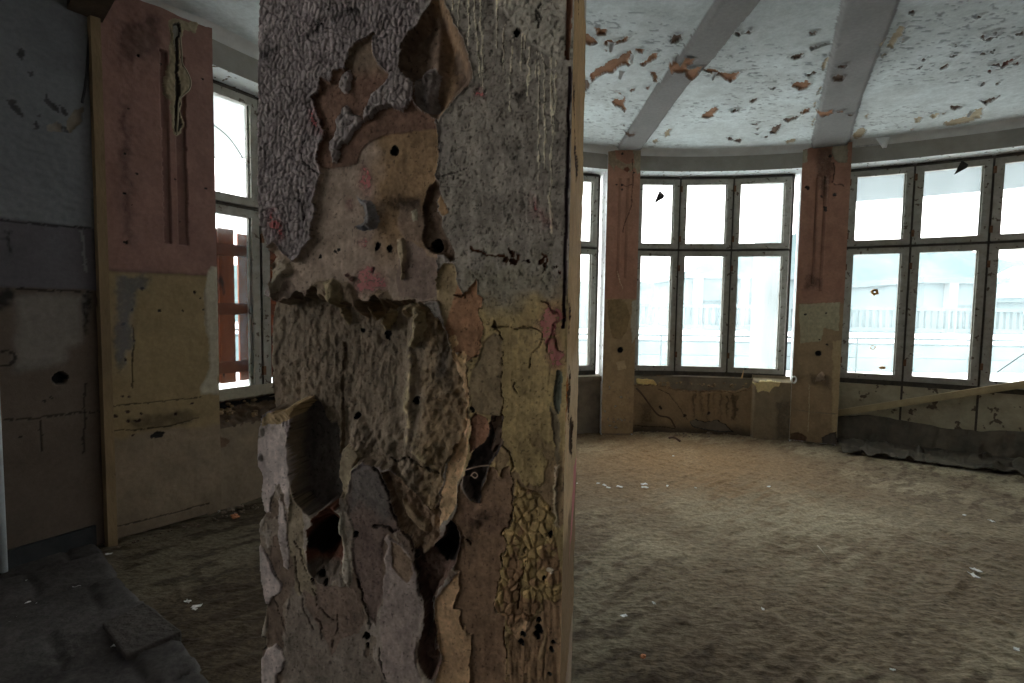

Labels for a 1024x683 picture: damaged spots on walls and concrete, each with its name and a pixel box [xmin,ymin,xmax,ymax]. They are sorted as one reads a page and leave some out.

peeling [669,58,740,83]
peeling [702,107,718,119]
peeling [752,31,890,148]
peeling [910,32,1019,131]
flaking render [257,0,562,683]
crack [454,294,563,658]